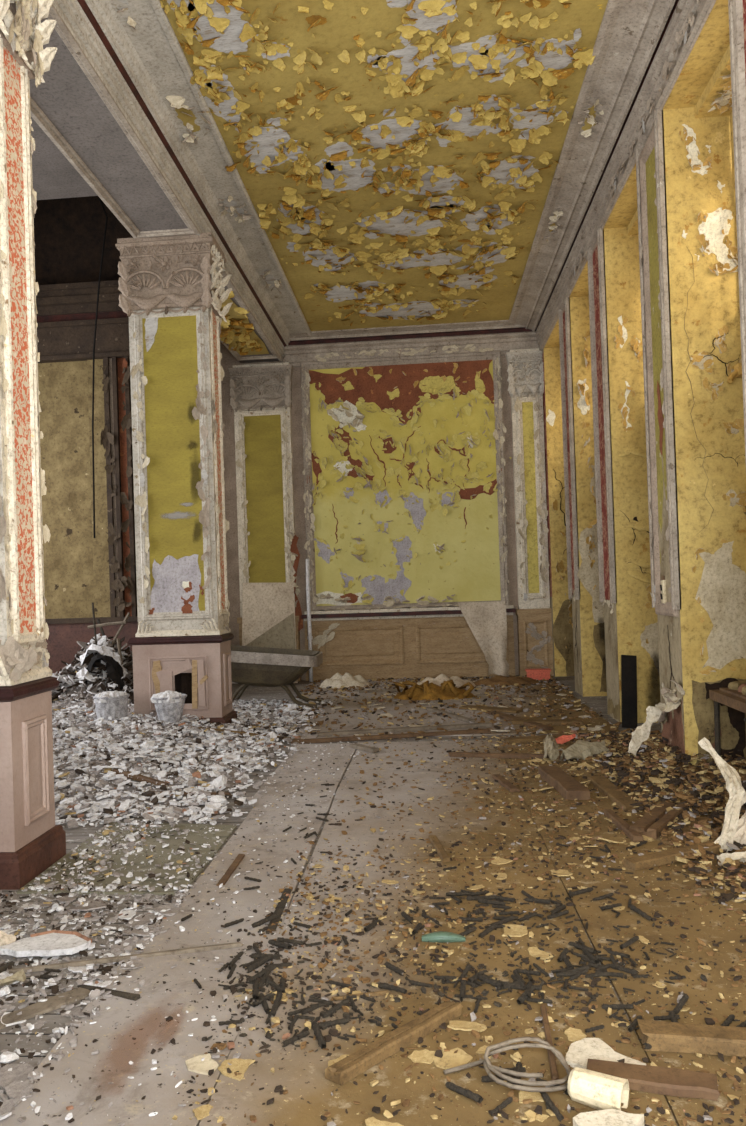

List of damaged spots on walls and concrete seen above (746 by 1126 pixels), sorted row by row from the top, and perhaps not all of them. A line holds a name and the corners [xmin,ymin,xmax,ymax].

peeling [8,0,44,87]
peeling [0,435,51,682]
peeling [100,291,269,631]
peeling [160,0,604,326]
crack [369,426,470,528]
peeling [281,330,620,722]
peeling [614,279,662,369]
peeling [618,368,674,609]
peeling [655,539,746,766]
peeling [679,124,725,193]
peeling [682,207,738,276]
peeling [690,325,742,401]